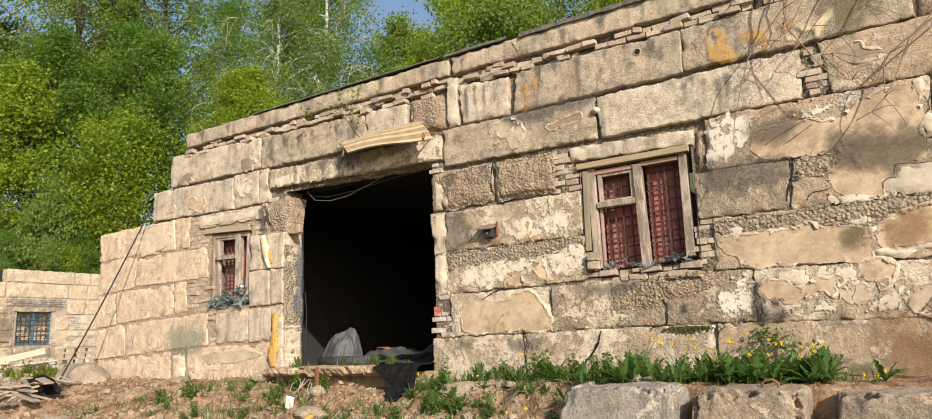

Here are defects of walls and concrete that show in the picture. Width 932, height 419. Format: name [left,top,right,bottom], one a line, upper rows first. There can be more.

corrosion [706,28,737,62]
peeling [434,115,587,336]
peeling [611,76,932,318]
crack [764,120,829,201]
crack [585,331,602,363]